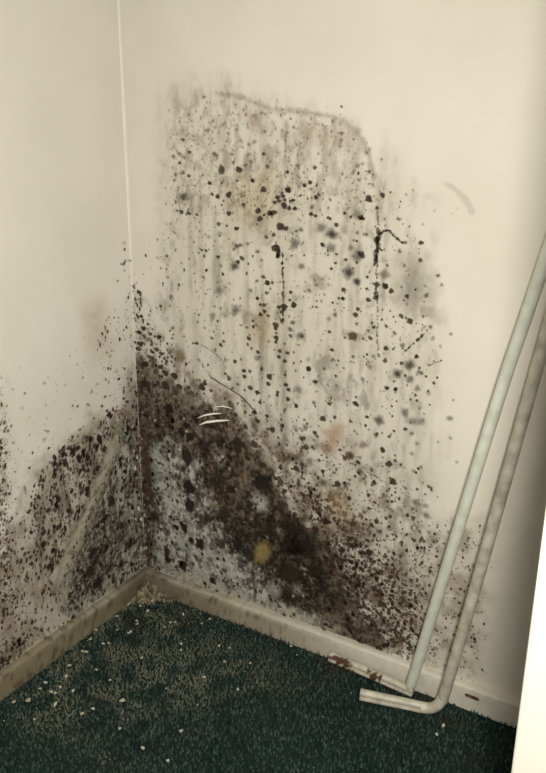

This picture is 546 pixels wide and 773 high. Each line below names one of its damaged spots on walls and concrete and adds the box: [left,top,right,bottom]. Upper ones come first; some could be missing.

leakage [0,153,446,671]
rust [329,655,354,672]
leakage [424,524,481,670]